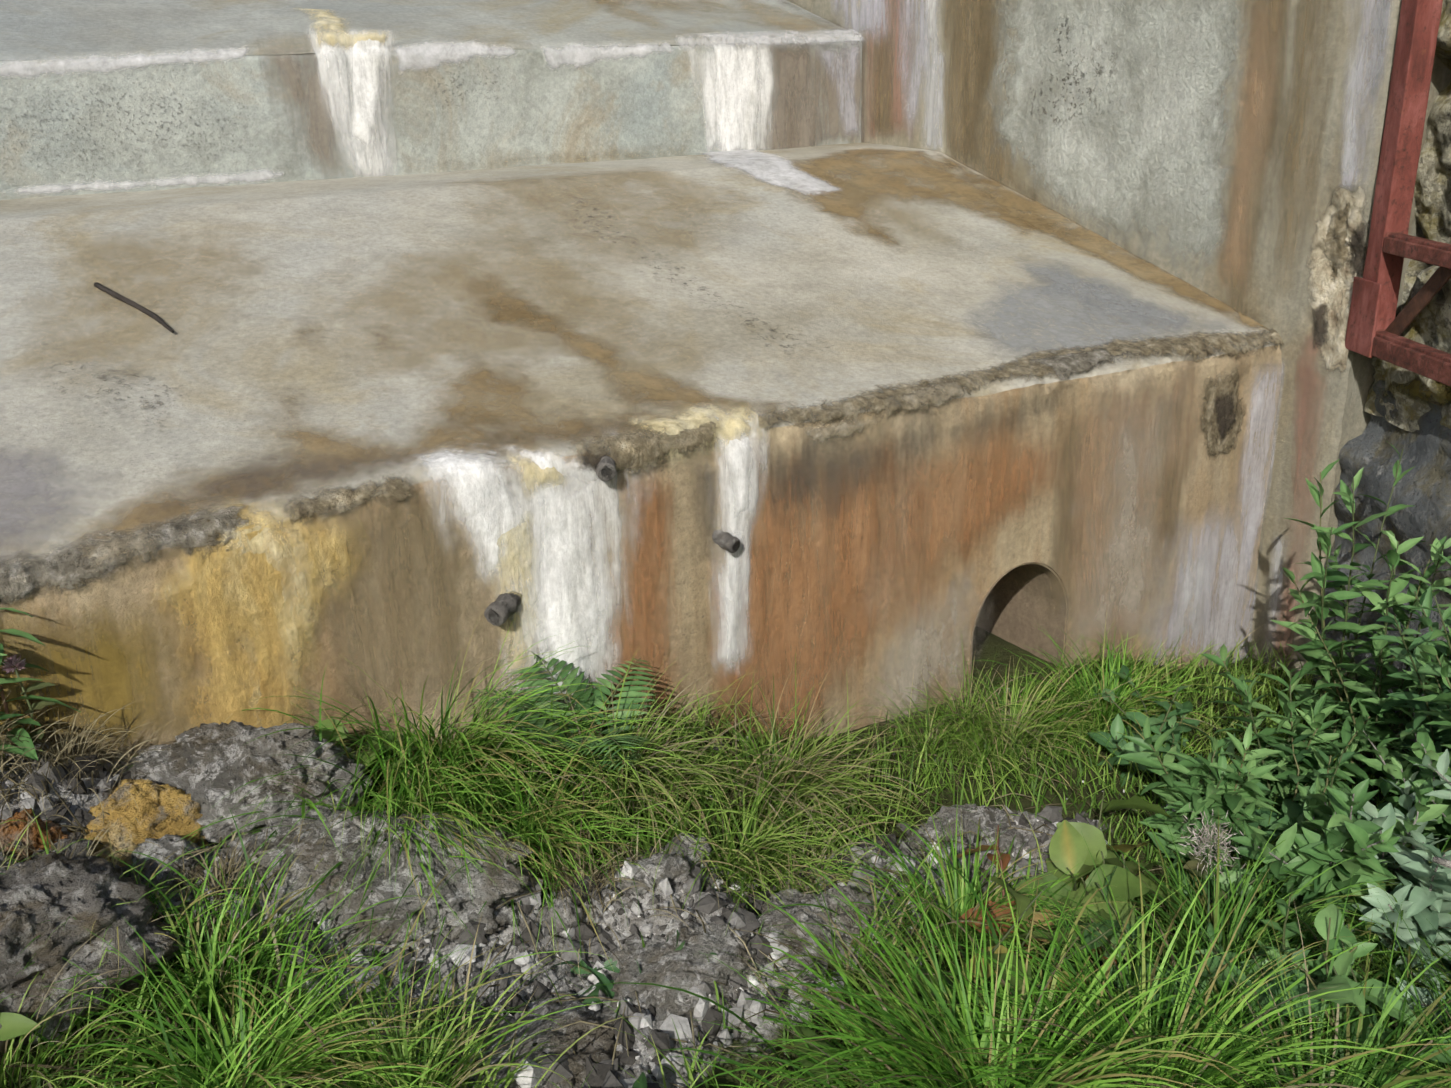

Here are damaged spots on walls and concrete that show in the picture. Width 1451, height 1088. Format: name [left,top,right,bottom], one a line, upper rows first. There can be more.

damp [276,9,391,177]
damp [679,0,1328,327]
spalling [0,505,249,601]
spalling [285,477,412,524]
damp [87,244,867,728]
corrosion [606,486,670,707]
spalling [571,421,717,474]
corrosion [719,453,920,741]
spalling [752,329,1284,456]
damp [982,267,1187,352]
spalling [1307,187,1368,371]